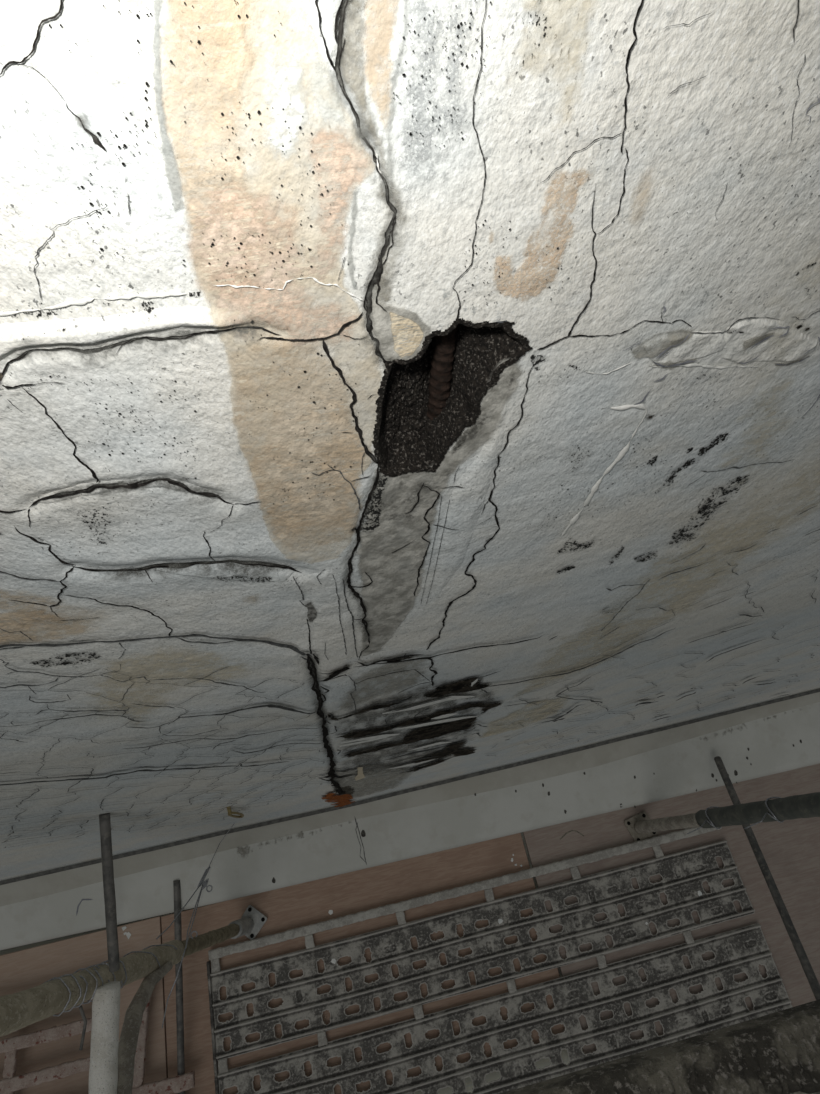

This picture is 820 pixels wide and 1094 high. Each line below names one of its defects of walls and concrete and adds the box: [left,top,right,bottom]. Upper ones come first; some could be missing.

water stain [153,0,473,562]
water stain [495,171,587,298]
water stain [73,506,115,546]
crack [0,0,820,847]
spalling [372,312,532,477]
water stain [655,433,729,493]
water stain [481,472,820,738]
spalling [327,677,502,773]
corrosion [322,793,355,807]
crack [355,818,367,865]